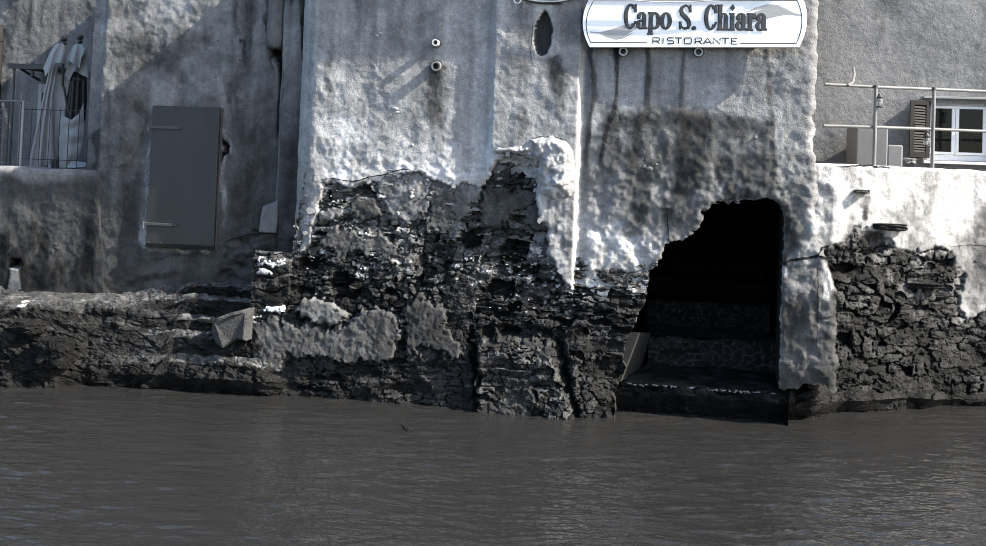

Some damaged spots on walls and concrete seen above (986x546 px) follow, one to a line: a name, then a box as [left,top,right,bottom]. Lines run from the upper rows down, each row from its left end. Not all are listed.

leakage [549,56,563,90]
leakage [584,50,597,158]
leakage [599,48,752,223]
leakage [0,223,92,291]
spalling [248,152,658,377]
spalling [824,225,986,371]
spalling [521,369,556,388]